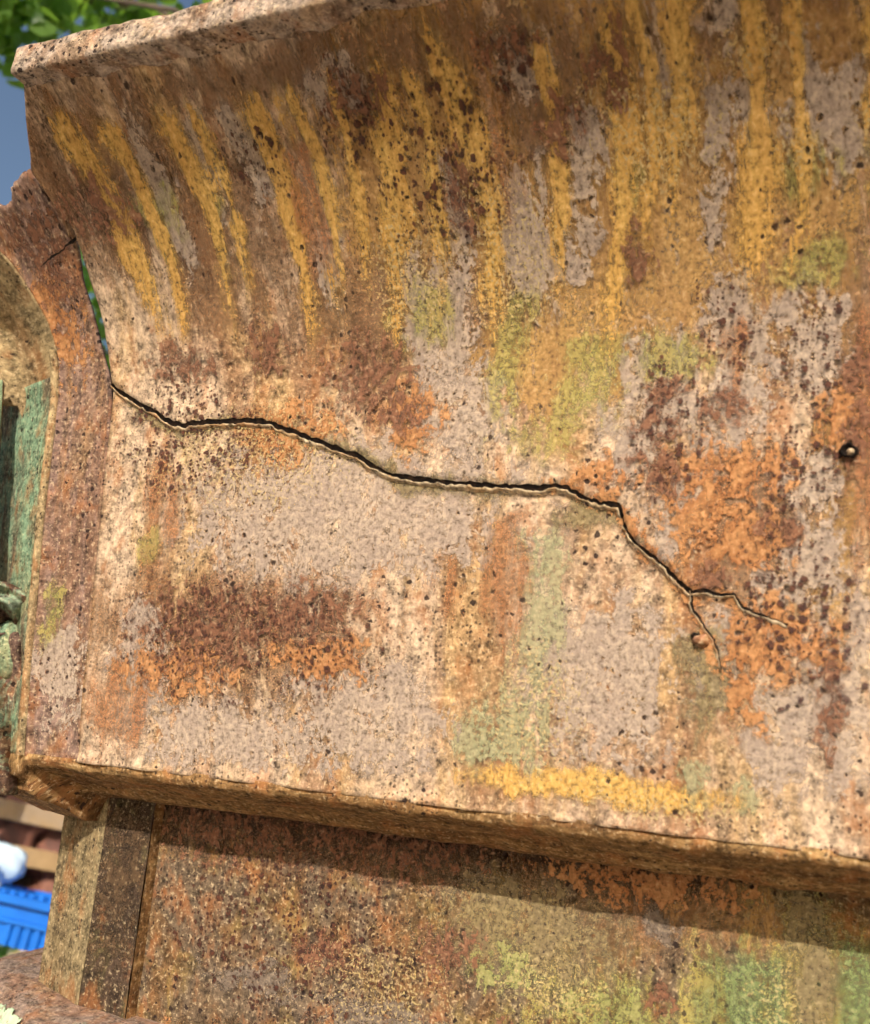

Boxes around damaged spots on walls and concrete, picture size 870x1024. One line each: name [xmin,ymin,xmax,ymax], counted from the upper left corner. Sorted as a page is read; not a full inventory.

water stain [238,59,450,338]
water stain [421,13,507,340]
water stain [527,33,572,294]
water stain [599,0,703,340]
water stain [734,0,815,287]
water stain [861,4,870,57]
rust [1,0,870,771]
crack [110,382,788,671]
peeling [0,1003,23,1024]
rust [160,805,866,966]